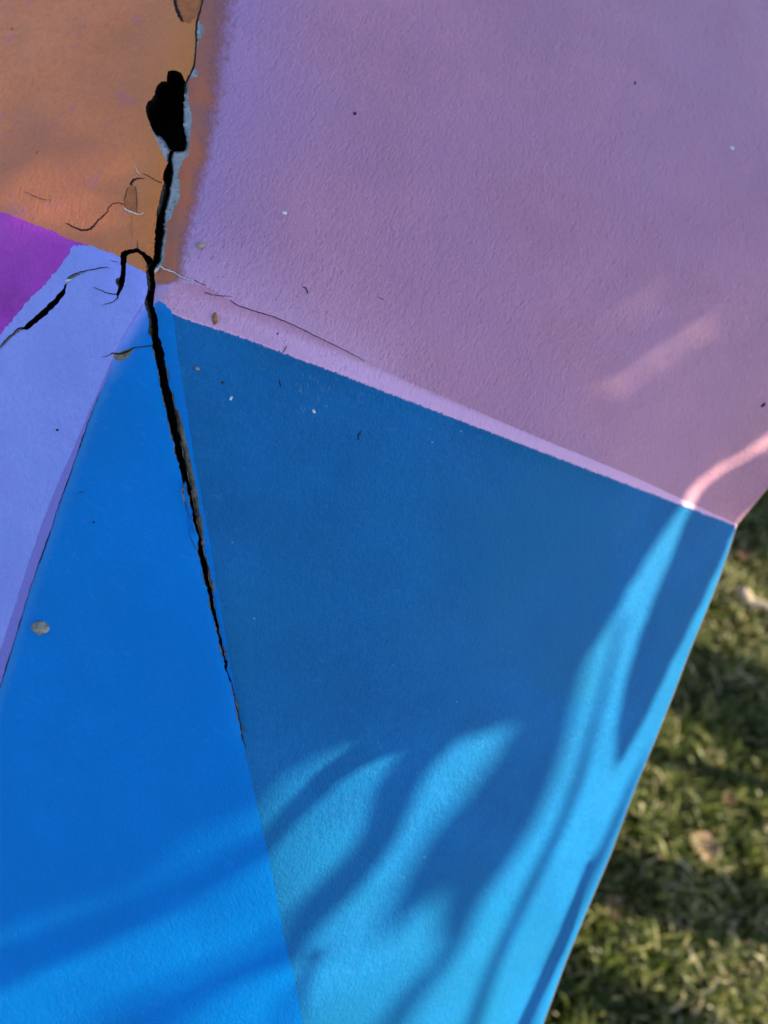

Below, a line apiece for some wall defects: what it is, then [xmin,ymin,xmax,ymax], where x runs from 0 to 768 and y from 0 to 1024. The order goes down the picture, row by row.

peeling [152,129,170,163]
crack [0,0,364,748]